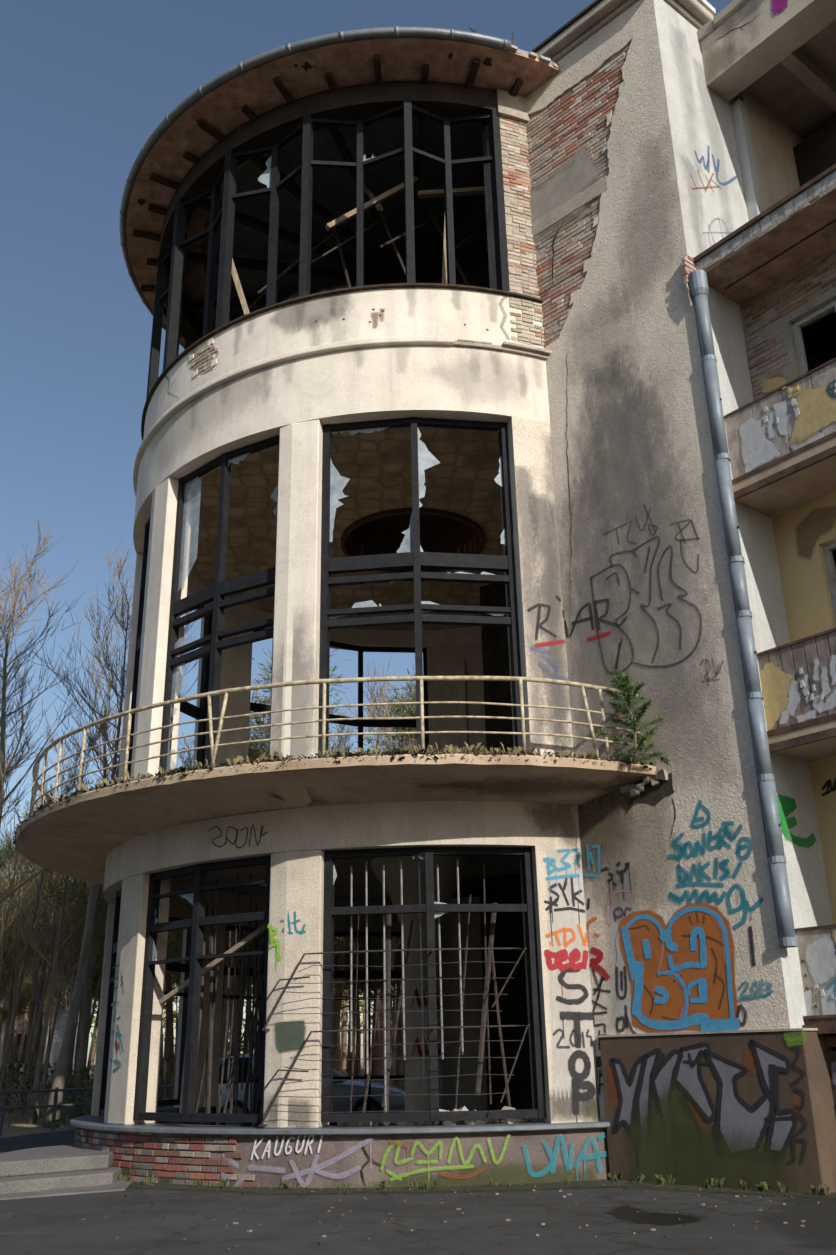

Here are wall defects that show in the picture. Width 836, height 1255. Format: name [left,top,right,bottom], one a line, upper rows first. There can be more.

flaking render [457,45,630,348]
flaking render [189,338,219,379]
peeling [740,258,836,473]
peeling [759,655,836,731]
spalling [620,769,674,814]
peeling [801,929,836,1016]